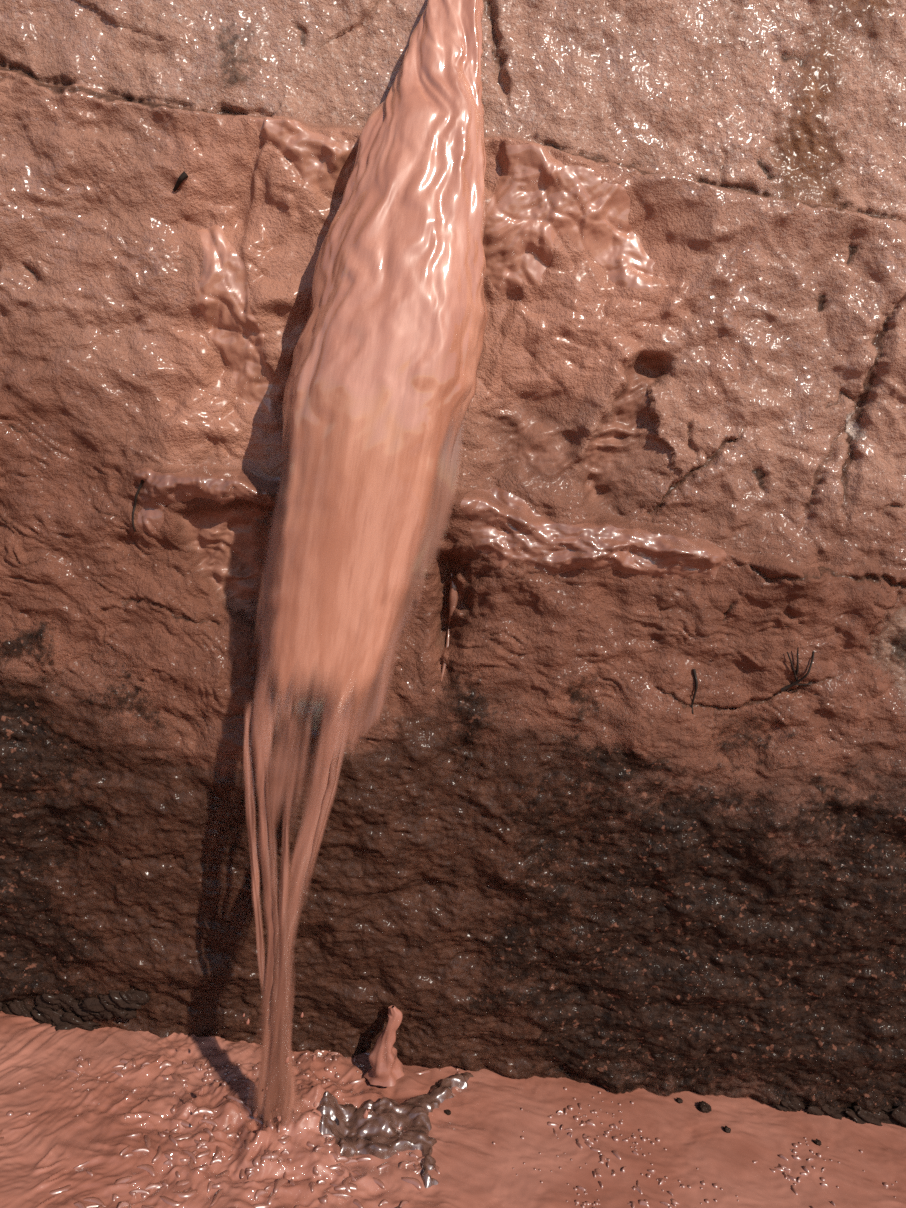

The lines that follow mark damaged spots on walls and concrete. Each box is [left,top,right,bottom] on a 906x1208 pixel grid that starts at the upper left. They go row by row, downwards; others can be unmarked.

crack [485,0,502,63]
crack [0,62,242,115]
crack [543,144,770,197]
crack [802,202,892,219]
crack [807,317,888,506]
crack [650,430,736,514]
water stain [0,621,54,664]
water stain [892,634,906,668]
water stain [0,672,312,1045]
water stain [291,664,906,1114]